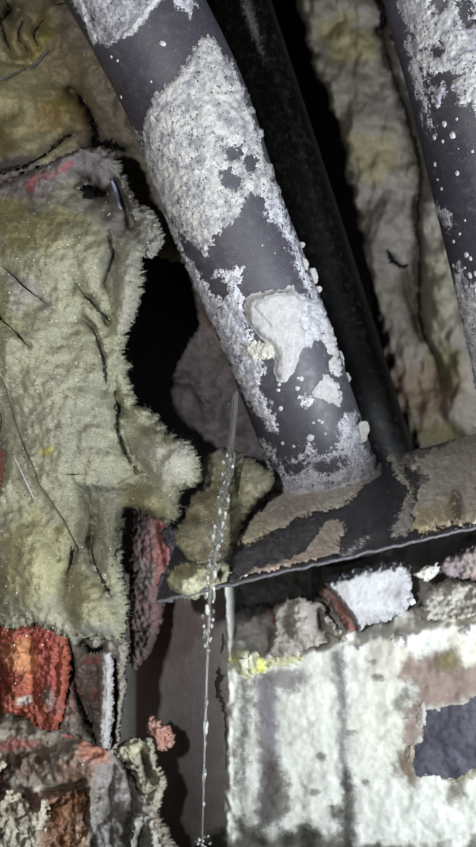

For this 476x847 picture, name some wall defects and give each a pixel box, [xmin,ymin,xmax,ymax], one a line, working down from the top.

damp [70,0,161,48]
damp [173,0,199,20]
damp [241,0,269,71]
damp [396,0,476,135]
damp [133,34,476,582]
damp [196,648,356,847]
damp [396,688,410,713]
peeling [405,696,476,784]